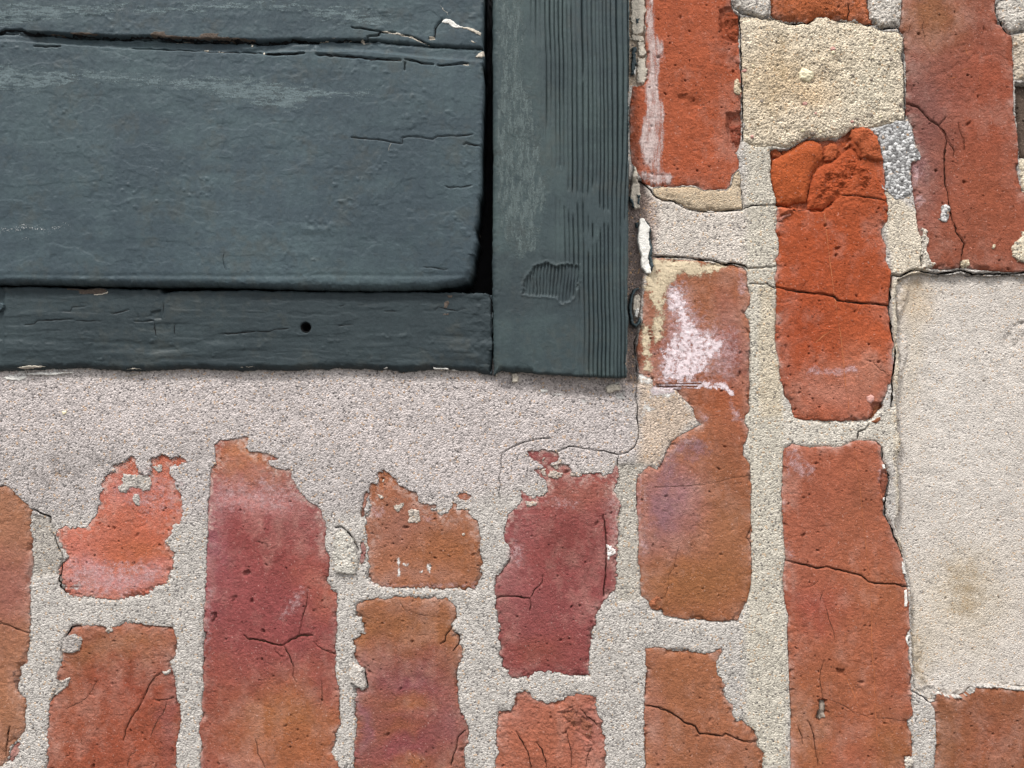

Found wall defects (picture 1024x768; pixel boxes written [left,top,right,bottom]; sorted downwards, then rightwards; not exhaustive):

crack [0,23,463,70]
peeling [630,18,648,85]
peeling [442,0,546,258]
spalling [728,115,742,148]
spalling [770,127,883,222]
crack [638,5,1024,407]
peeling [635,220,654,272]
peeling [632,294,640,318]
water stain [650,281,734,396]
crack [498,337,639,496]
crack [786,560,908,636]
crack [649,705,754,743]